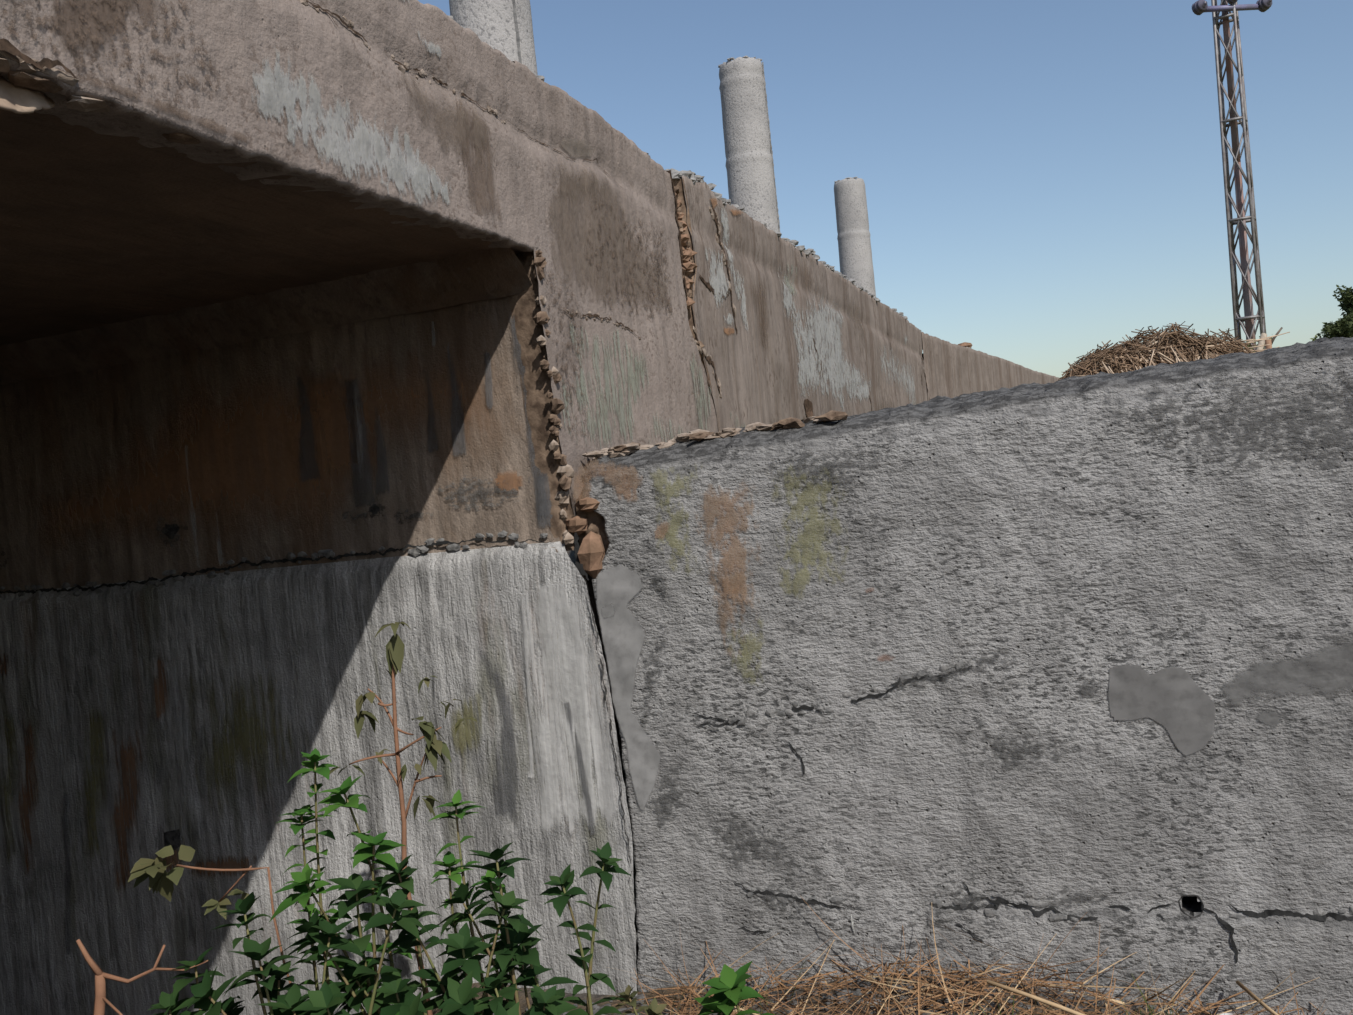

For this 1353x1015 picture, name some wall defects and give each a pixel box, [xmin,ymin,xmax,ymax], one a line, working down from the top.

crack [666,170,737,432]
spalling [509,250,848,556]
damp [1108,635,1353,756]
crack [787,742,805,774]
crack [735,882,844,933]
crack [930,882,1170,942]
crack [1202,903,1353,963]